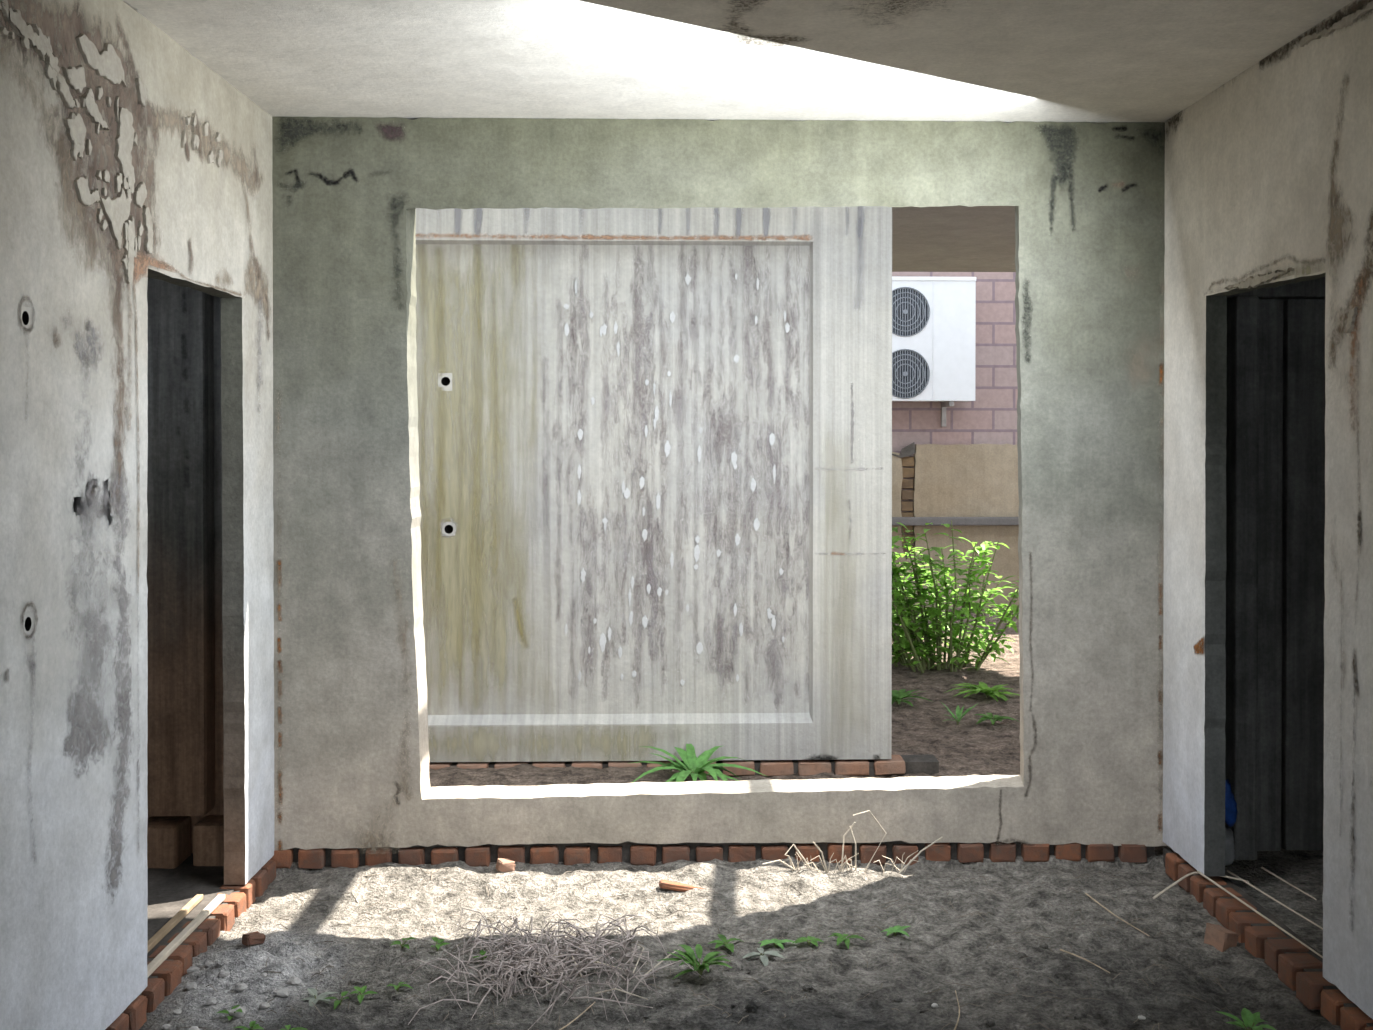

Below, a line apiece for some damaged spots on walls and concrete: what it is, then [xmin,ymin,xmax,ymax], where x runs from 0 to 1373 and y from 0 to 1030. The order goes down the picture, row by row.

damp [723,0,801,46]
crack [1260,0,1373,66]
peeling [0,0,157,284]
damp [1040,125,1076,231]
crack [1331,216,1373,427]
damp [65,237,134,897]